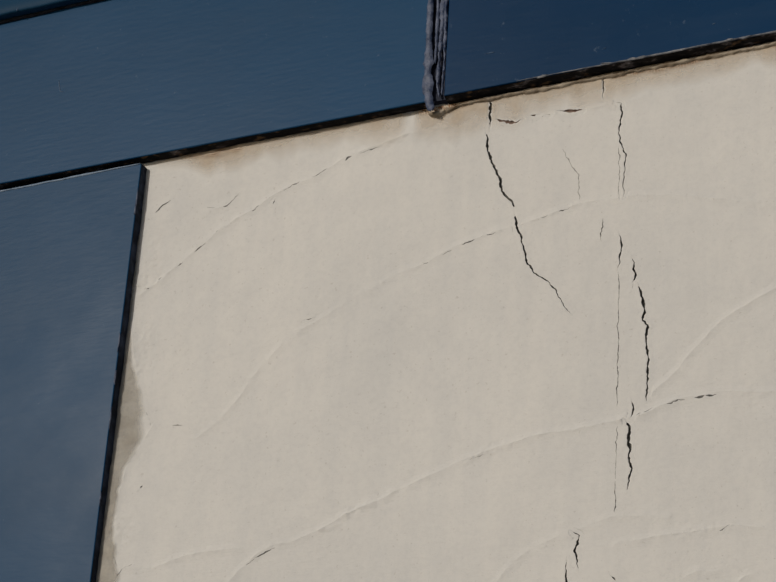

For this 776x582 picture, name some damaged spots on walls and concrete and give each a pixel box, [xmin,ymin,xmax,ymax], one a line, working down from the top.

crack [598,80,632,200]
crack [481,96,576,319]
crack [560,526,584,582]
crack [605,570,622,582]